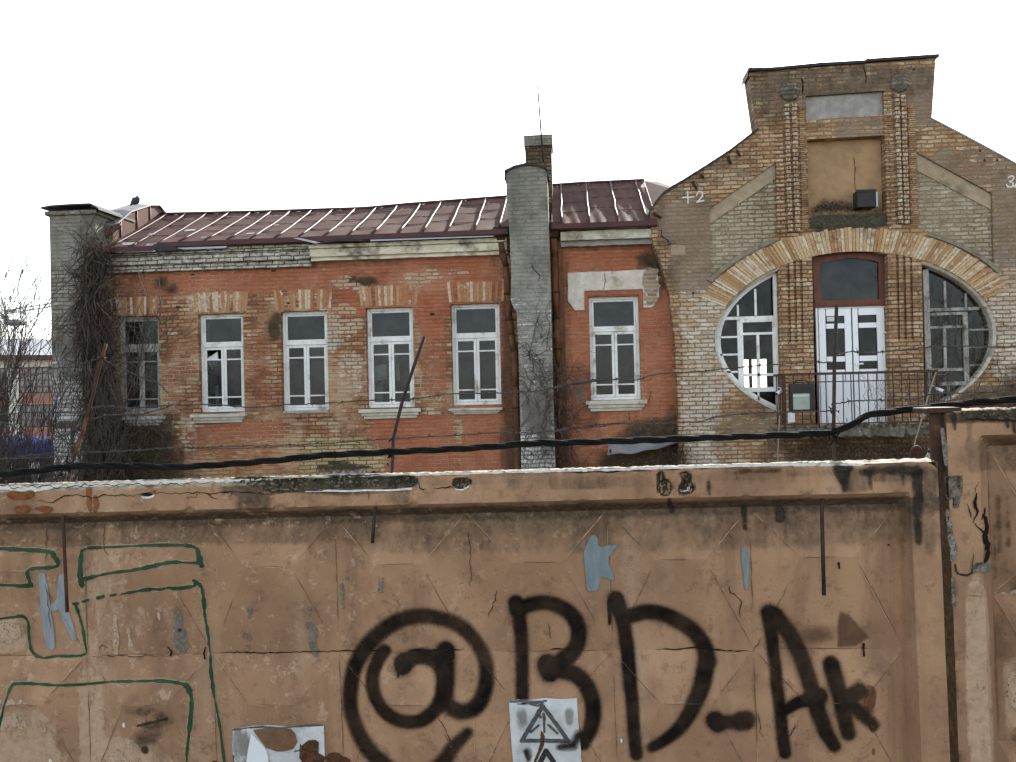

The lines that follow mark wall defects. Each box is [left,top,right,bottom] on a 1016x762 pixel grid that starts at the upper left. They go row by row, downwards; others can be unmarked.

crack [0,480,275,503]
spalling [453,478,471,491]
spalling [657,471,695,496]
crack [967,483,991,568]